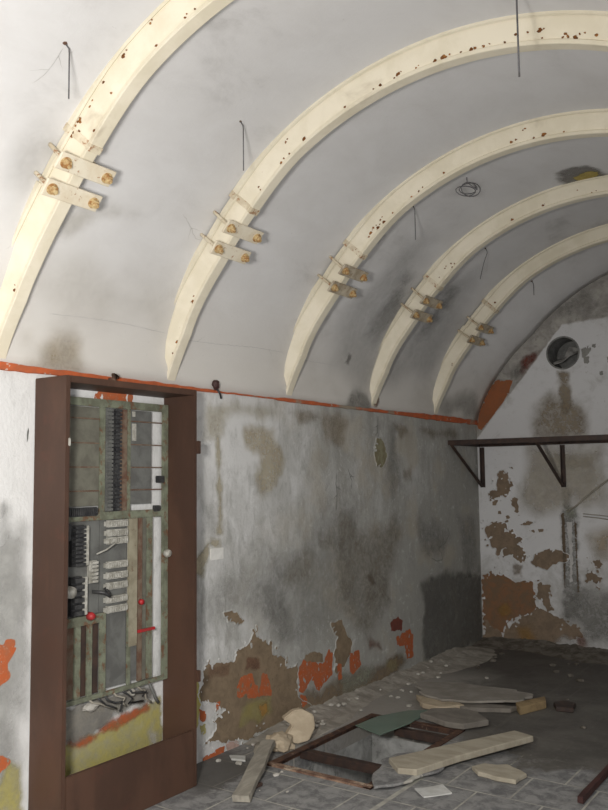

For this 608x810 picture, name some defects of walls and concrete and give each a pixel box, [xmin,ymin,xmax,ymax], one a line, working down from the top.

spalling [477,353,536,431]
flaking render [481,466,585,646]
flaking render [222,609,245,626]
water stain [423,573,482,659]
peeling [0,639,16,686]
flaking render [197,617,414,762]
peeling [0,756,21,810]